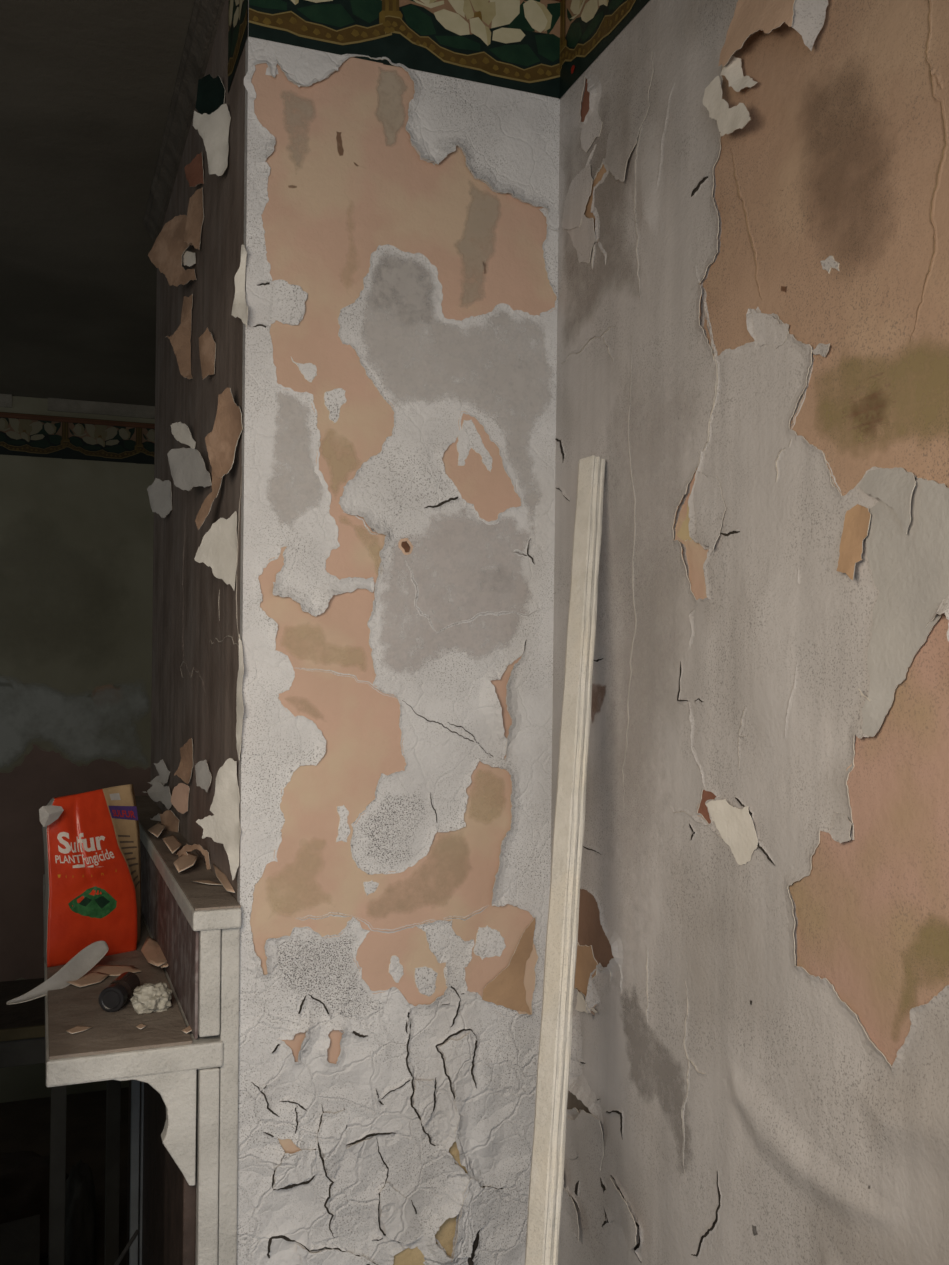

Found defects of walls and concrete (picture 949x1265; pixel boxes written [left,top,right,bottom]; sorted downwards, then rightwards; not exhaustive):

peeling [0,46,606,1019]
peeling [675,462,708,600]
peeling [702,0,949,1066]
water stain [0,678,148,766]
peeling [670,784,776,867]
peeling [578,889,614,967]
crack [251,963,504,1265]
peeling [382,1107,483,1265]
crack [562,1173,644,1264]
crack [595,1097,625,1140]
crack [681,979,706,1174]
crack [691,1171,723,1259]